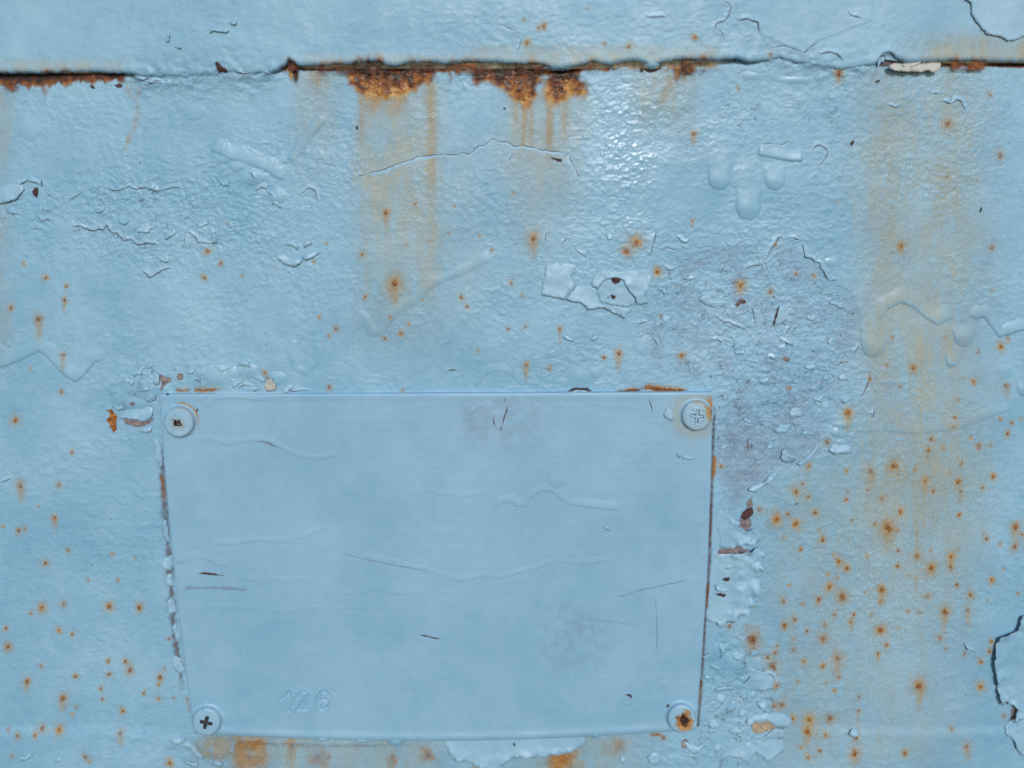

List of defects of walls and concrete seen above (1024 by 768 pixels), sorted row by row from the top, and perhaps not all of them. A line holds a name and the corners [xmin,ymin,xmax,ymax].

corrosion [0,70,125,91]
corrosion [284,56,715,143]
crack [356,139,584,181]
peeling [542,246,697,318]
peeling [699,295,794,361]
peeling [107,363,203,433]
peeling [706,407,852,628]
corrosion [773,513,799,529]
corrosion [816,554,849,602]
corrosion [676,710,693,731]
peeling [681,634,792,765]
corrosion [790,715,828,759]